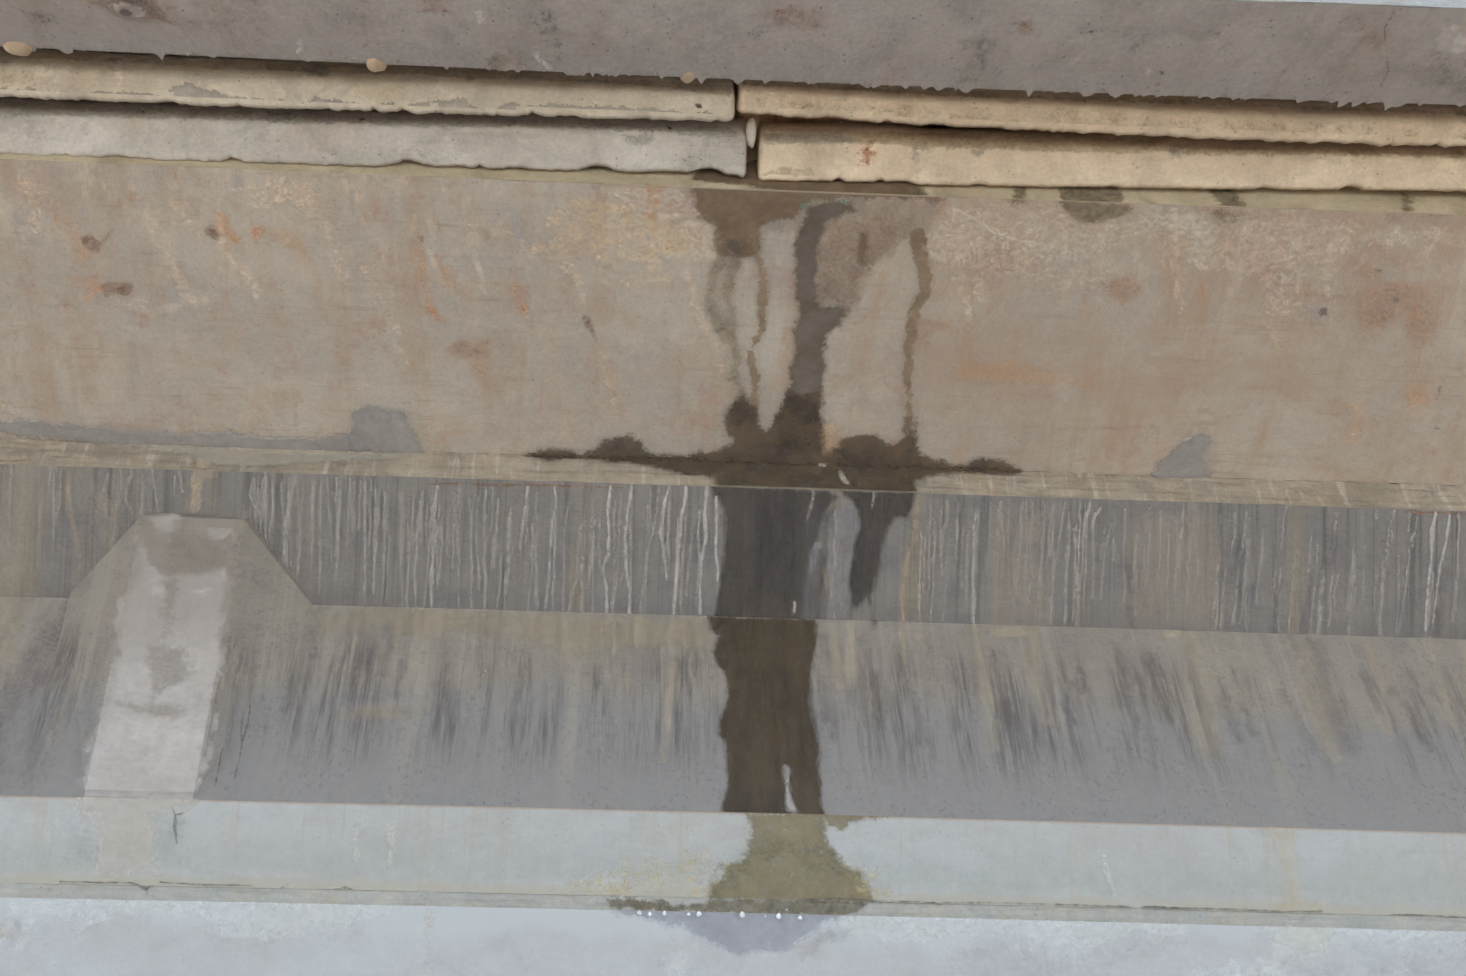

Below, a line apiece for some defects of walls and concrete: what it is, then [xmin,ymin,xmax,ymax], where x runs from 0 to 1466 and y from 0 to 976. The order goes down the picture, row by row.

water stain [102,459,211,544]
water stain [248,159,1466,976]